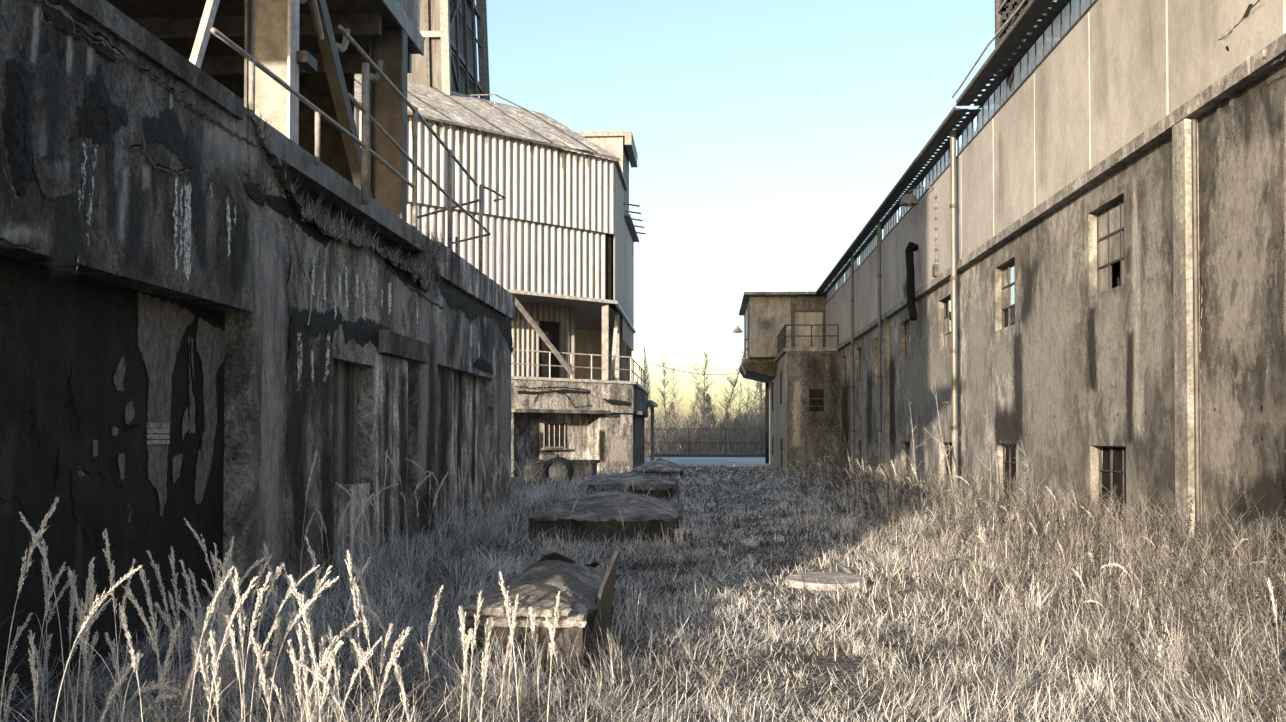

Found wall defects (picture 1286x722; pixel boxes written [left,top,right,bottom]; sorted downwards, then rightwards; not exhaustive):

leakage [31,7,39,63]
leakage [40,36,92,157]
leakage [0,138,153,275]
peeling [93,291,226,517]
spalling [288,306,391,349]
leakage [173,111,510,602]
leakage [865,183,1173,498]
leakage [1200,97,1286,528]